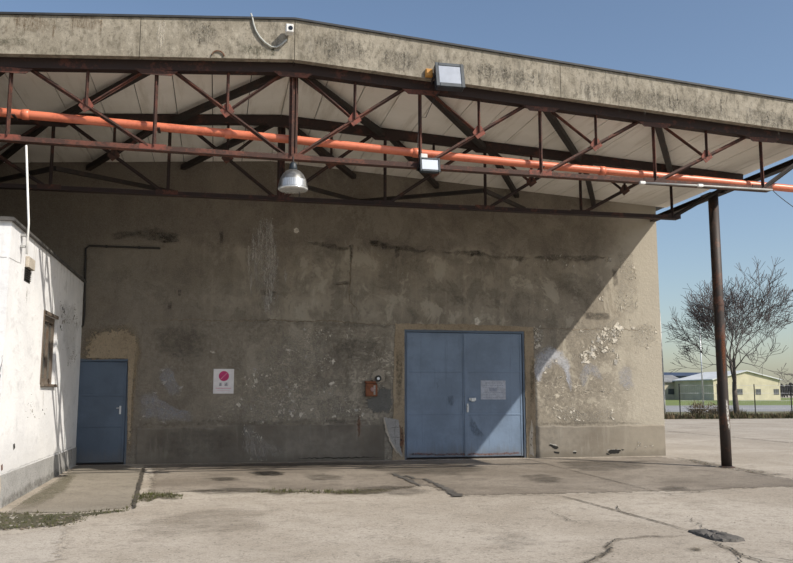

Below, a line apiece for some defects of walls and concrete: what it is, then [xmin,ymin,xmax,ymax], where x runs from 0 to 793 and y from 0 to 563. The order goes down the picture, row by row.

peeling [572,319,658,367]
flaking render [67,328,178,444]
flaking render [384,417,404,459]
crack [584,535,653,563]
crack [675,515,792,563]